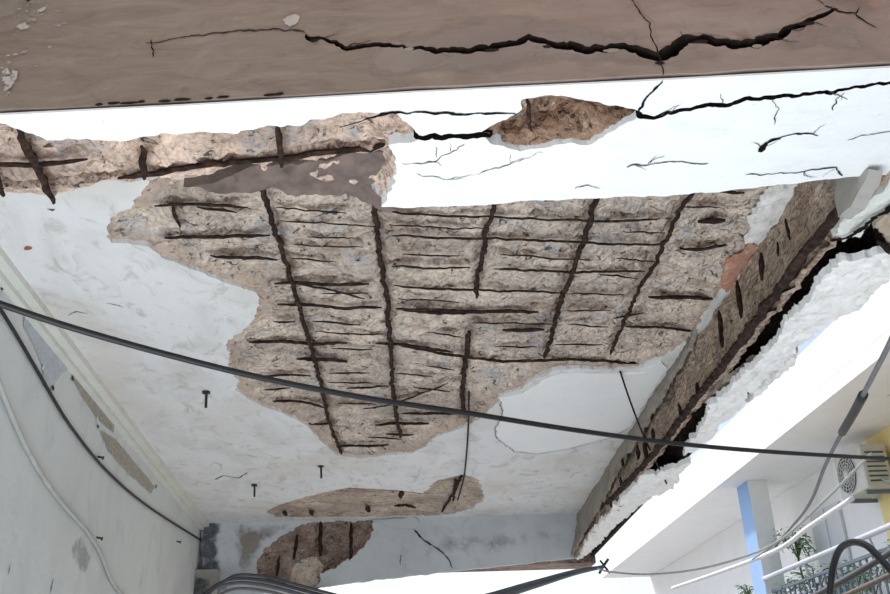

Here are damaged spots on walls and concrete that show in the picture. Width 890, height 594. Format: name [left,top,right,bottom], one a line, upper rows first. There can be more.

crack [145,0,890,153]
crack [340,111,538,180]
spalling [483,96,635,146]
crack [627,155,708,170]
crack [747,167,843,178]
spalling [0,112,890,560]
spalling [257,474,484,594]
crack [414,530,452,567]